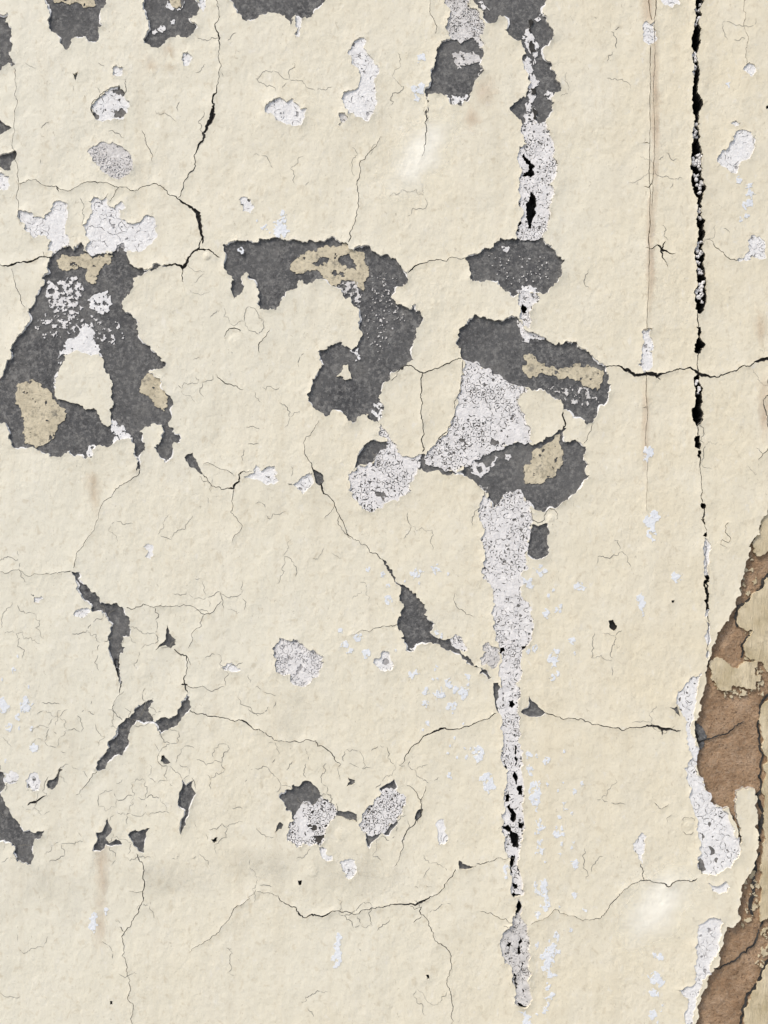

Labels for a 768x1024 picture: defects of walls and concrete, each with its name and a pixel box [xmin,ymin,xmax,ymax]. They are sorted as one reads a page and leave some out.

peeling [45,0,106,50]
peeling [143,0,206,48]
peeling [0,197,203,474]
crack [12,0,269,351]
crack [178,357,382,584]
peeling [222,0,611,1007]
crack [646,225,675,258]
crack [606,349,768,506]
peeling [96,693,191,771]
crack [0,578,512,1022]
crack [544,708,681,735]
spalling [670,510,768,1024]